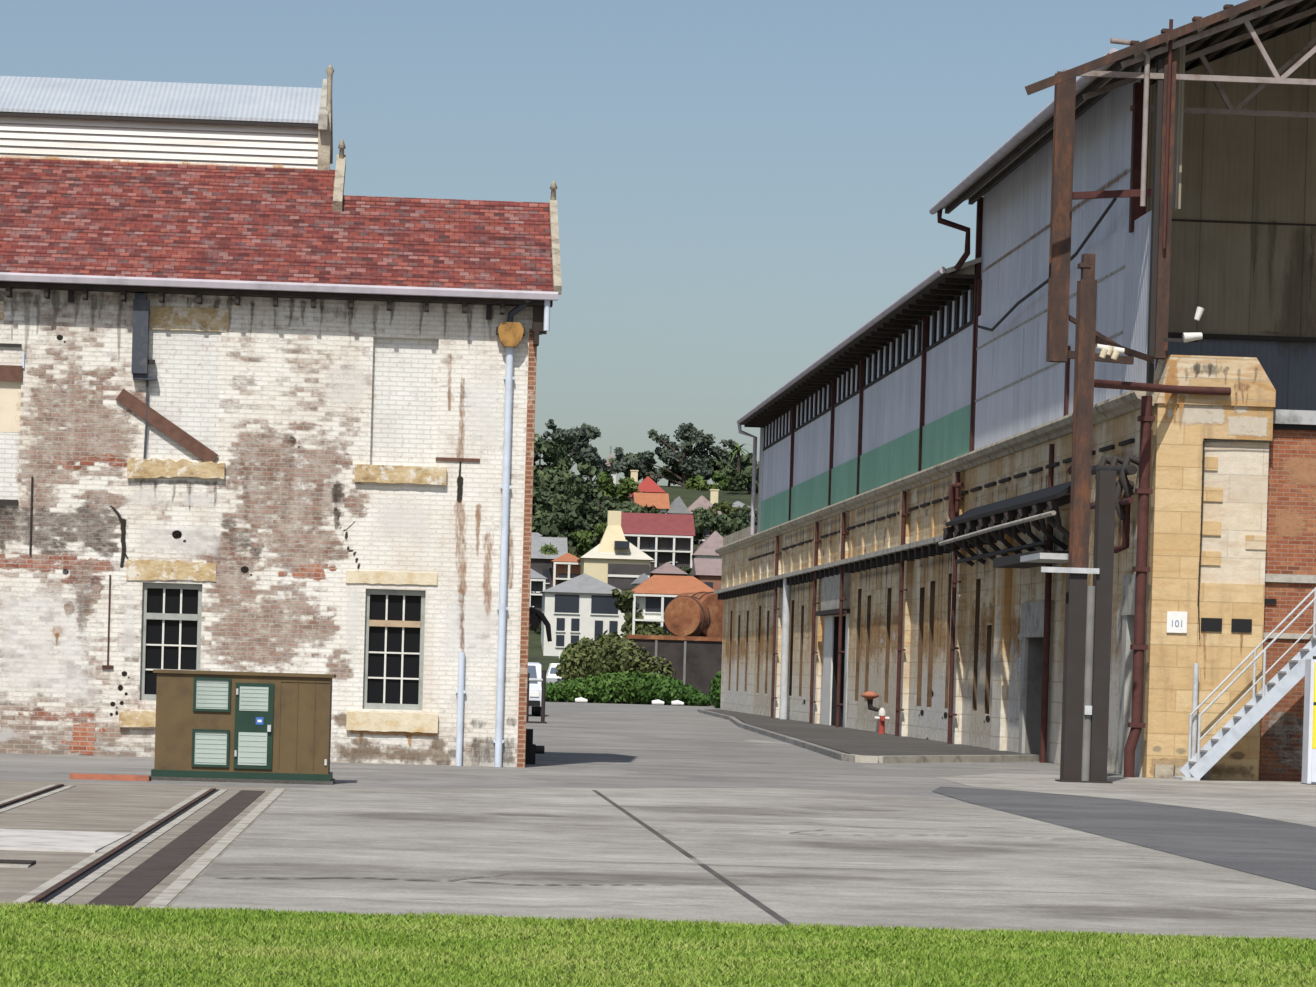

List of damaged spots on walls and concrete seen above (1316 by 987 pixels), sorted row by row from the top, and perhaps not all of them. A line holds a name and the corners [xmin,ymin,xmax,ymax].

peeling [16,335,146,513]
corrosion [448,380,464,457]
peeling [0,553,114,628]
peeling [202,420,368,679]
corrosion [457,502,491,605]